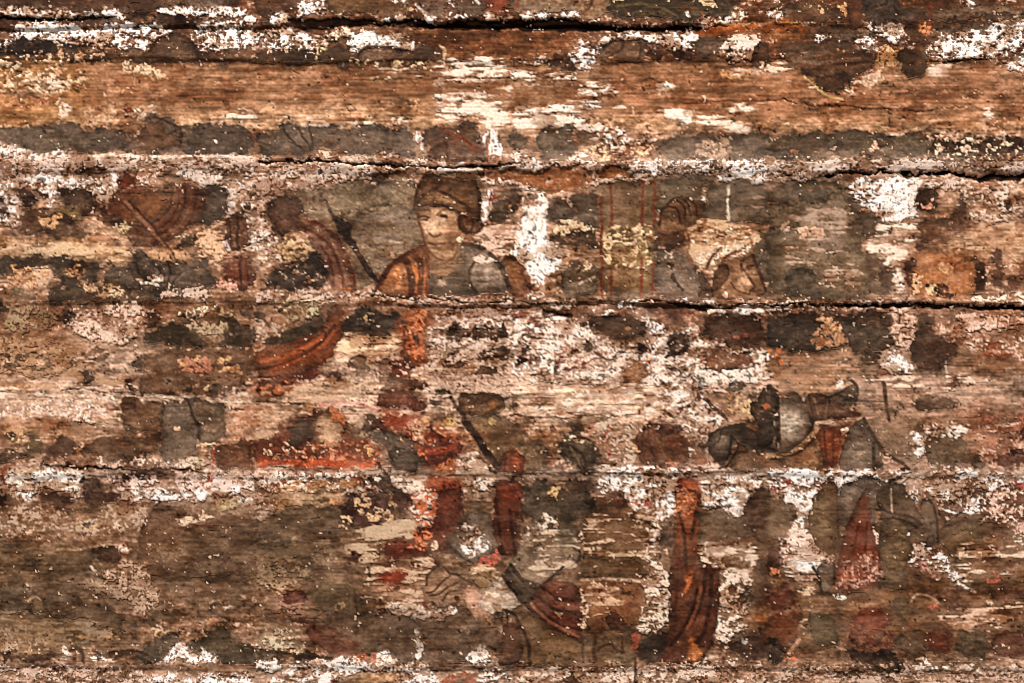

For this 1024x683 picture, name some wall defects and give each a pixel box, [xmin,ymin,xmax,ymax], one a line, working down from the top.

peeling [127,35,442,72]
peeling [326,0,1024,96]
crack [258,159,512,172]
crack [427,296,523,304]
crack [640,299,1024,313]
peeling [0,107,1024,614]